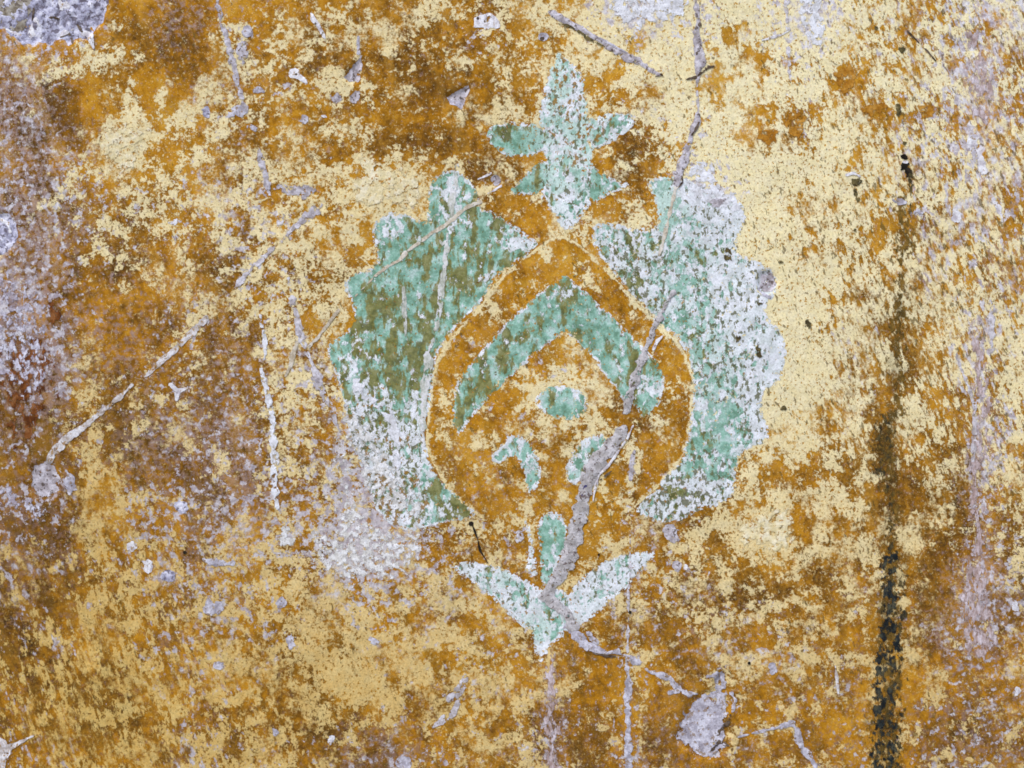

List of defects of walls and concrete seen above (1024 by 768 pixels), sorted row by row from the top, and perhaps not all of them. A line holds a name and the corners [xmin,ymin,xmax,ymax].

spalling [0,0,109,49]
leakage [865,141,924,768]
crack [563,538,698,768]
spalling [676,671,737,757]